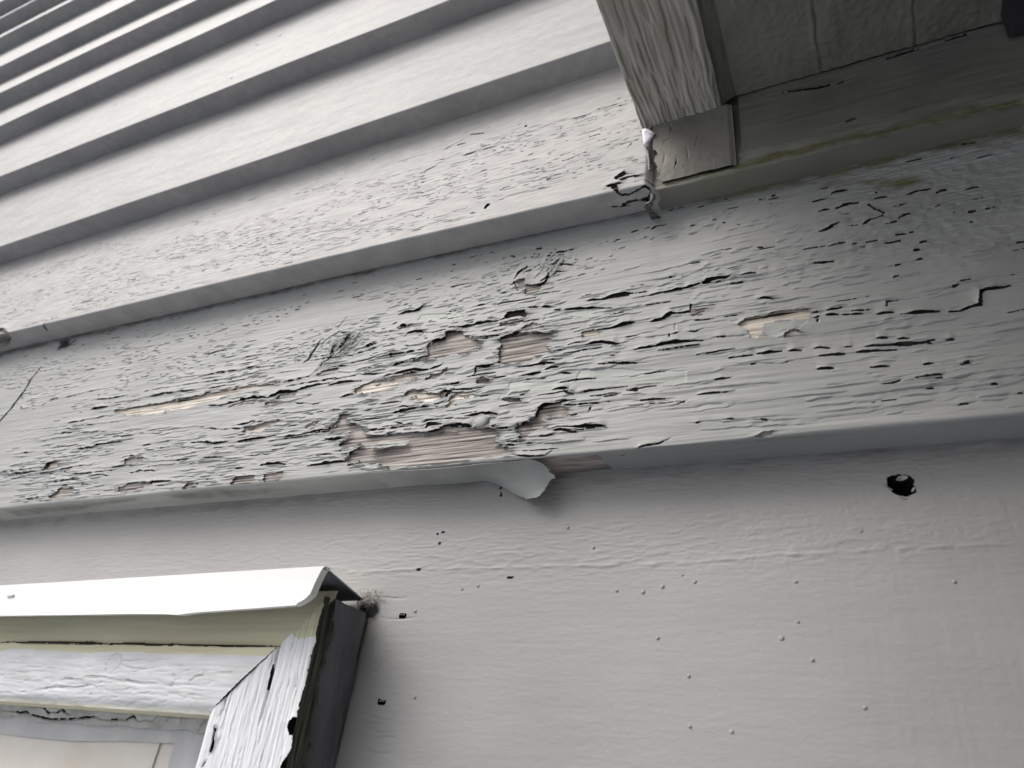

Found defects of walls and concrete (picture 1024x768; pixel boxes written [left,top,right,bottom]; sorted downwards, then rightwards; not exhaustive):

peeling [642,128,655,146]
peeling [603,169,657,207]
peeling [733,303,817,343]
peeling [110,379,302,437]
peeling [301,309,687,500]
peeling [747,424,783,441]
peeling [45,481,80,502]
peeling [112,452,152,497]
peeling [179,477,203,492]
peeling [228,467,289,487]
spalling [883,474,917,499]